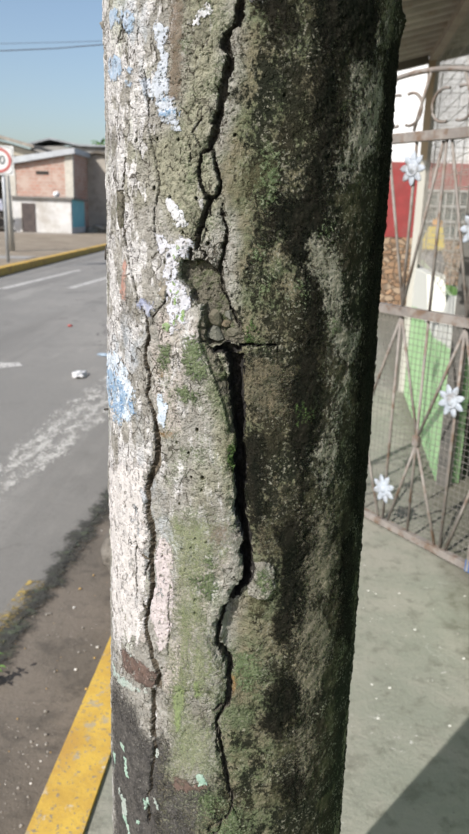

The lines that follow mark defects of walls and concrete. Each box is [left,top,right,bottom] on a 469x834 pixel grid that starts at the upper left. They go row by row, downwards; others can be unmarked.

peeling [100,8,135,36]
crack [121,157,129,248]
peeling [104,20,181,131]
crack [144,72,161,248]
peeling [104,351,137,430]
spalling [136,198,244,433]
crack [189,0,278,834]
water stain [239,0,406,812]
crack [133,276,170,821]